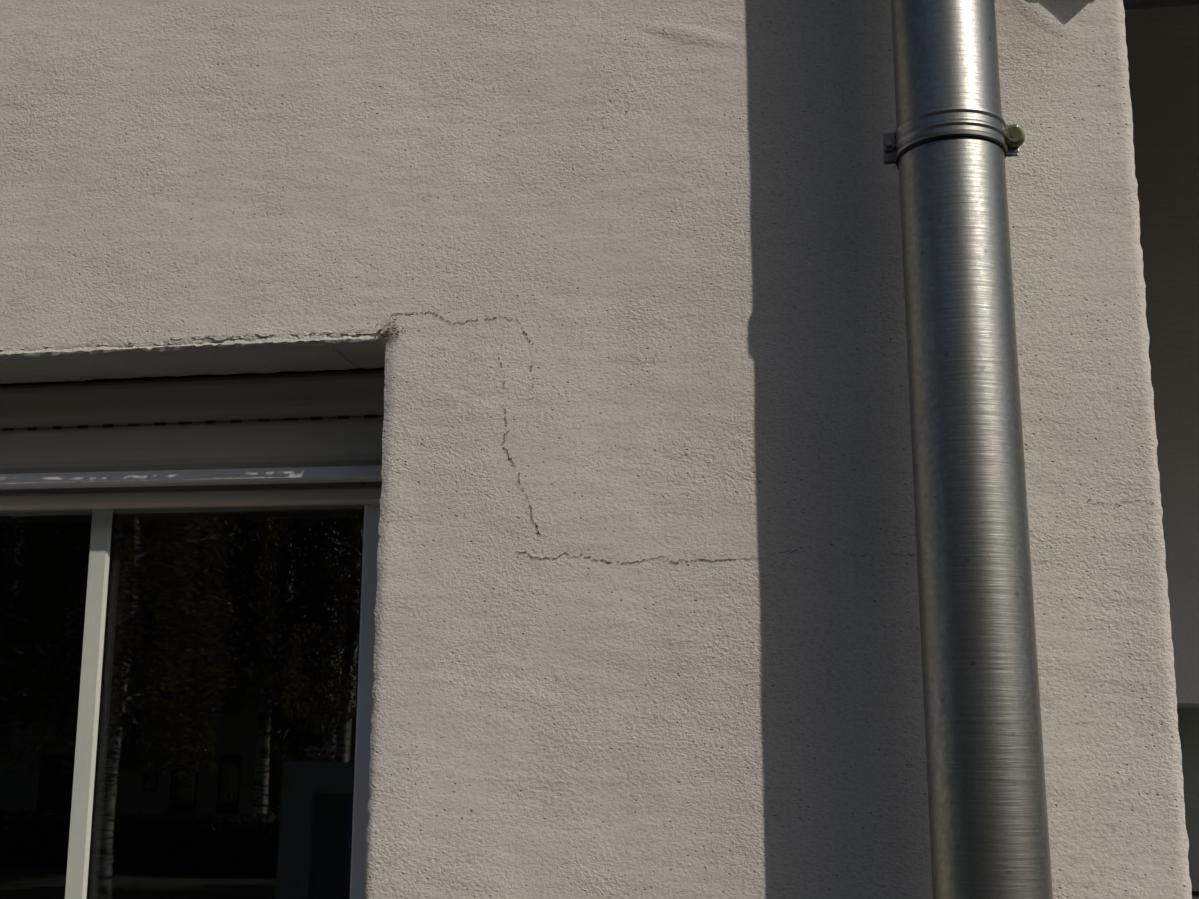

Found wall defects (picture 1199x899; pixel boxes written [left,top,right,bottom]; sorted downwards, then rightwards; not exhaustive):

crack [390,312,913,564]